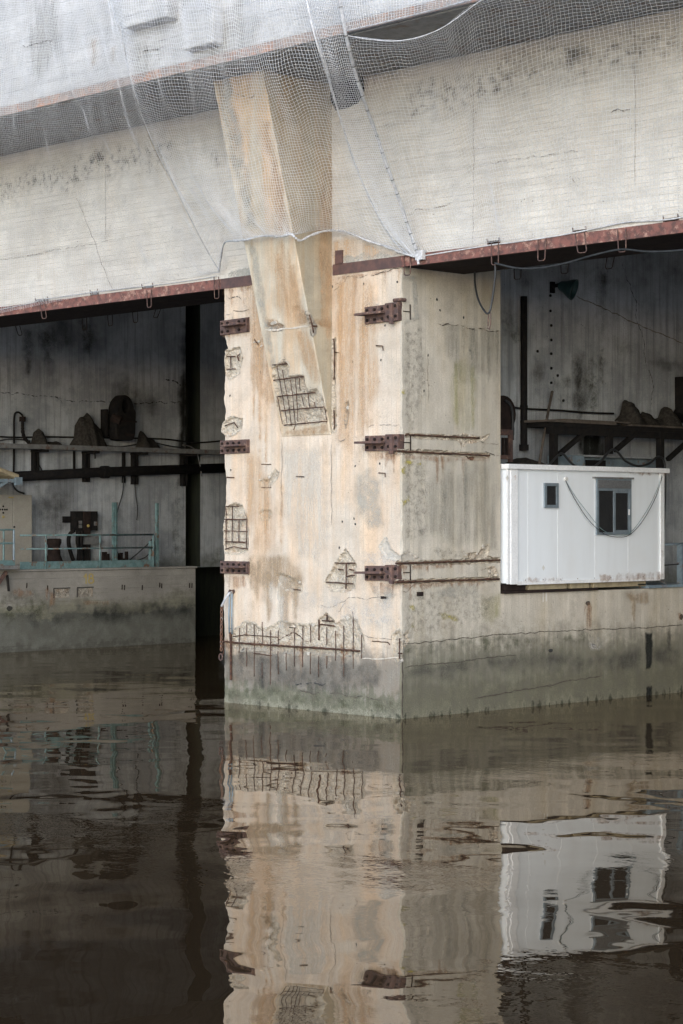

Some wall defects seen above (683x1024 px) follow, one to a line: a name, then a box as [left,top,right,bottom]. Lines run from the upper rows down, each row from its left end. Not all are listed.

spalling [224,320,285,380]
crack [577,280,683,404]
leakage [178,326,188,463]
spalling [271,338,350,434]
spalling [221,416,243,437]
spalling [223,502,272,555]
spalling [324,548,357,593]
spalling [223,611,409,685]
leakage [620,634,664,669]